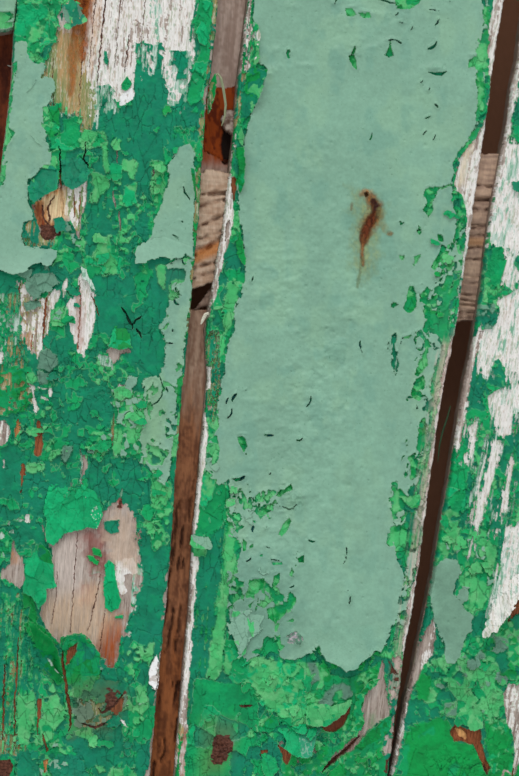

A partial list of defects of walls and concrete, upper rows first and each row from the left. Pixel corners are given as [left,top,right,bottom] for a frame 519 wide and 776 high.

rust [69,0,90,94]
peeling [0,0,218,137]
peeling [468,0,504,84]
peeling [0,157,100,359]
peeling [135,236,195,264]
peeling [207,22,268,319]
rust [360,190,381,268]
peeling [0,384,44,457]
peeling [243,47,519,776]
peeling [1,439,170,690]
peeling [174,412,219,776]
spalling [226,567,299,668]